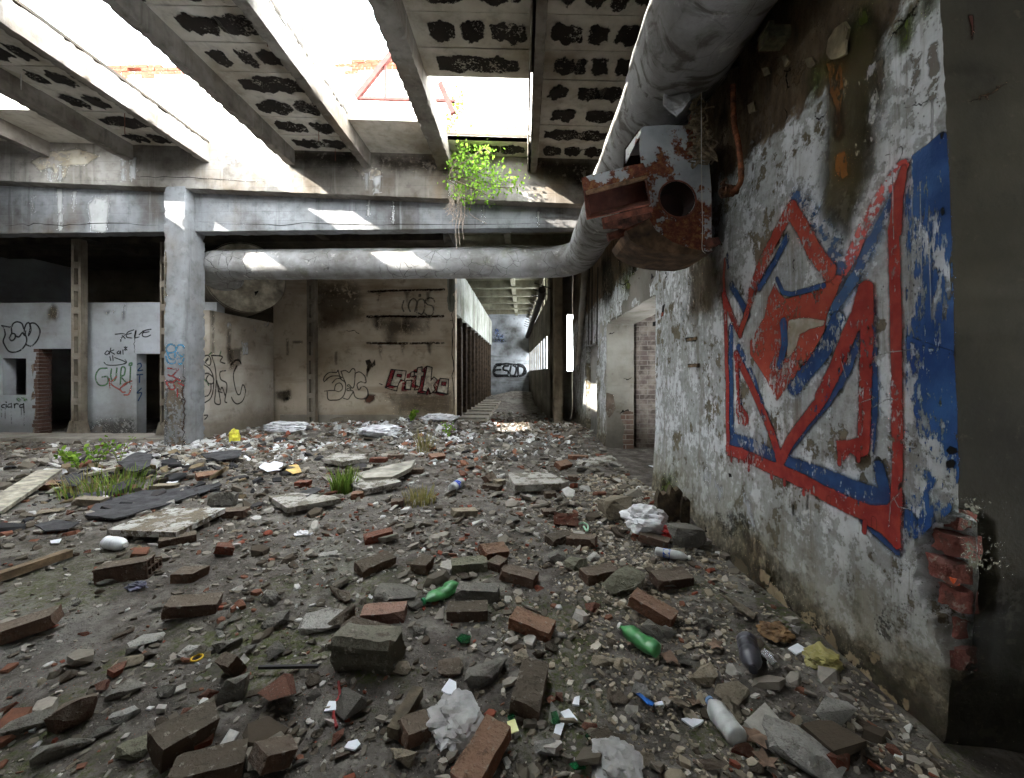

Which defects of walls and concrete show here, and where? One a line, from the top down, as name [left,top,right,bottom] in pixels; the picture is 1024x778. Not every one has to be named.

peeling [805,21,851,68]
peeling [906,42,940,101]
water stain [813,5,880,239]
peeling [32,149,98,180]
flaking render [925,509,983,671]